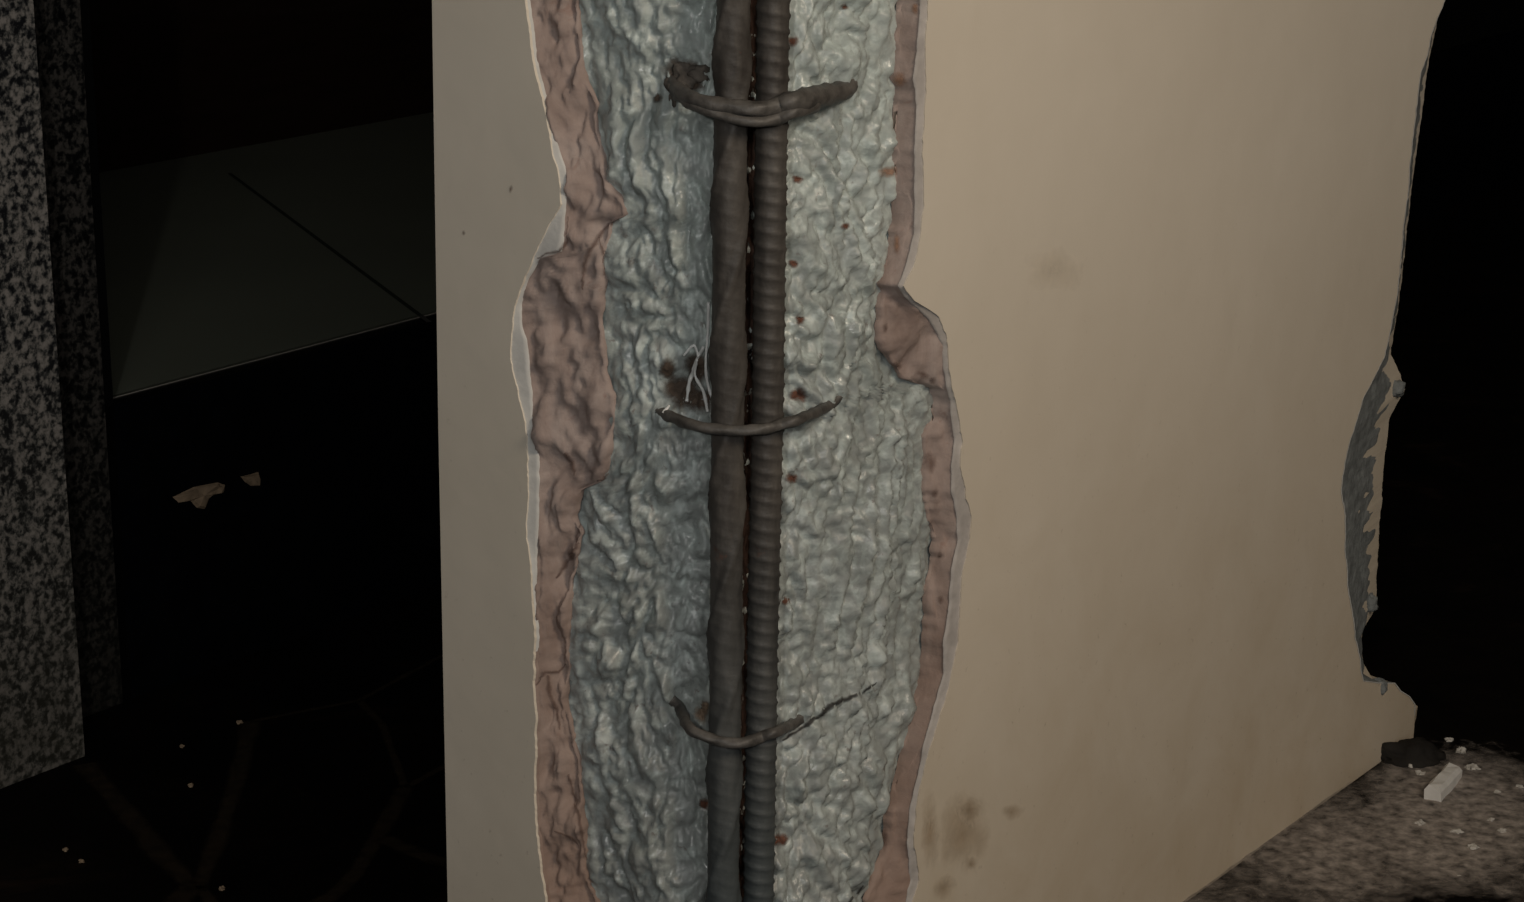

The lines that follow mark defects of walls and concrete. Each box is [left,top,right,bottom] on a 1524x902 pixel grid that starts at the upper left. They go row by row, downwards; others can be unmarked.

rust [654,59,710,108]
rust [660,355,711,409]
spalling [511,0,971,902]
spalling [1341,0,1445,716]